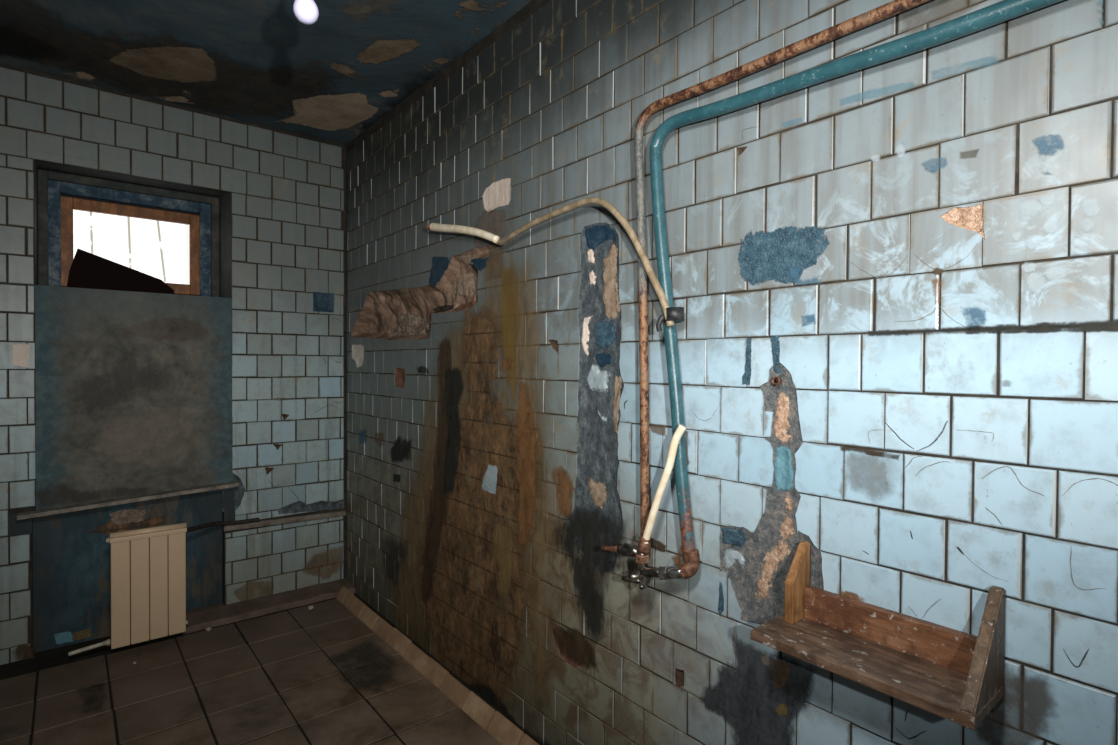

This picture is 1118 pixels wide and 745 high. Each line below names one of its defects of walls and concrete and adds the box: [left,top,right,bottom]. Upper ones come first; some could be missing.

peeling [109,46,217,104]
peeling [275,39,422,135]
peeling [483,178,511,212]
spalling [940,204,985,239]
flaking render [351,238,506,368]
spalling [567,223,624,572]
corrosion [650,425,665,435]
corrosion [841,446,899,459]
spalling [718,363,824,625]
corrosion [650,538,684,566]
damp [701,638,814,745]